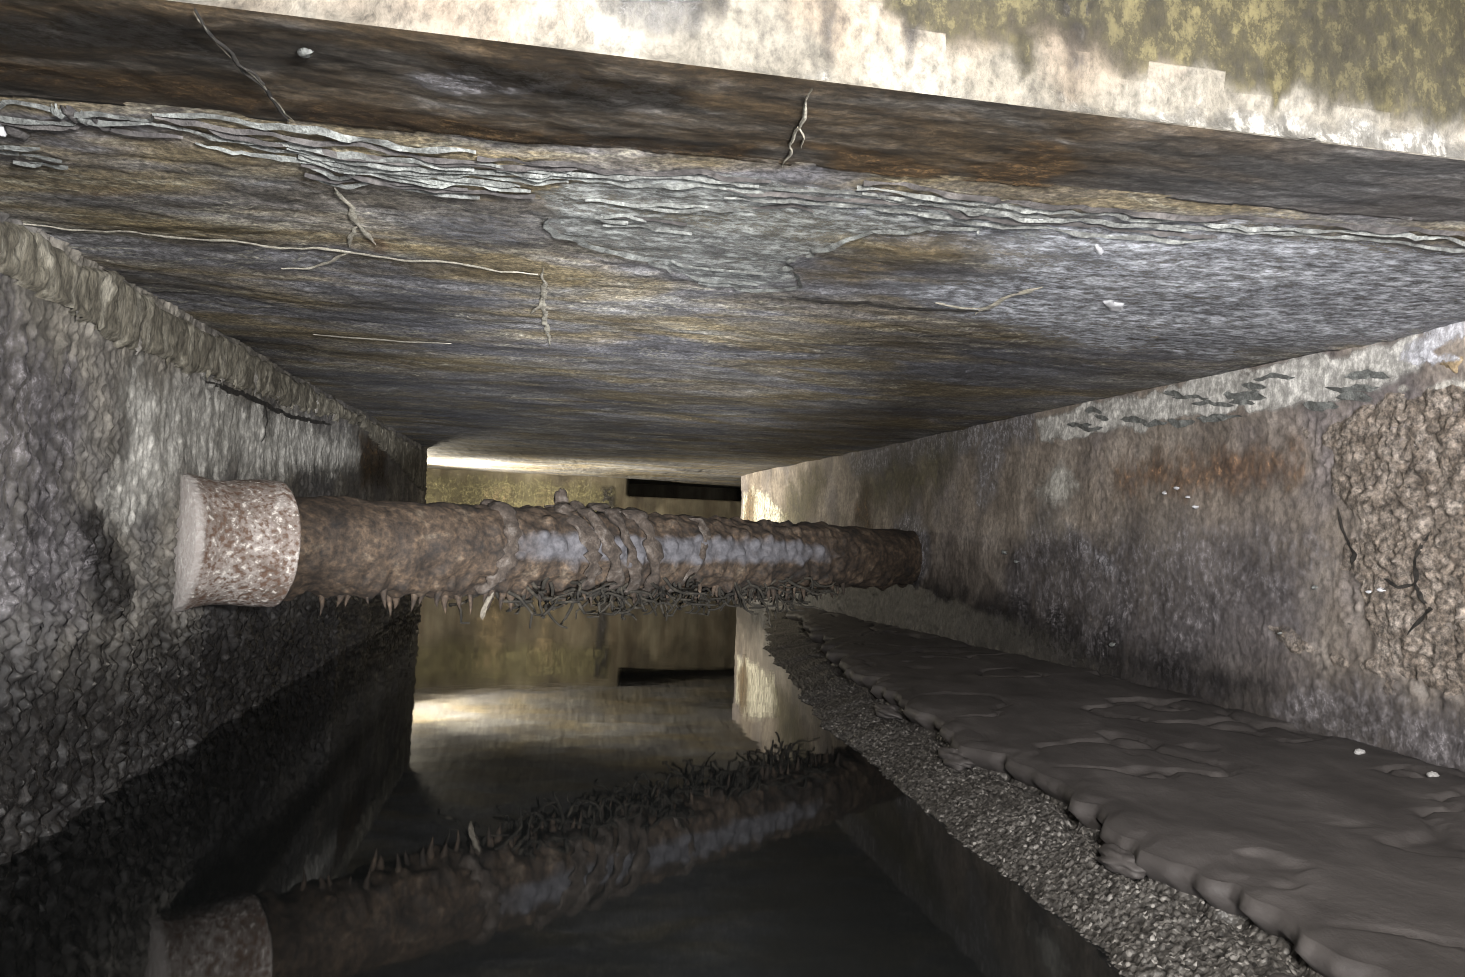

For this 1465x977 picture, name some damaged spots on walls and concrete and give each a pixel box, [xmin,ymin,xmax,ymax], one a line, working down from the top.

crack [193,8,295,123]
leakage [1017,34,1034,74]
leakage [1268,48,1294,108]
crack [782,88,813,167]
peeling [1103,300,1124,312]
spalling [850,321,1465,701]